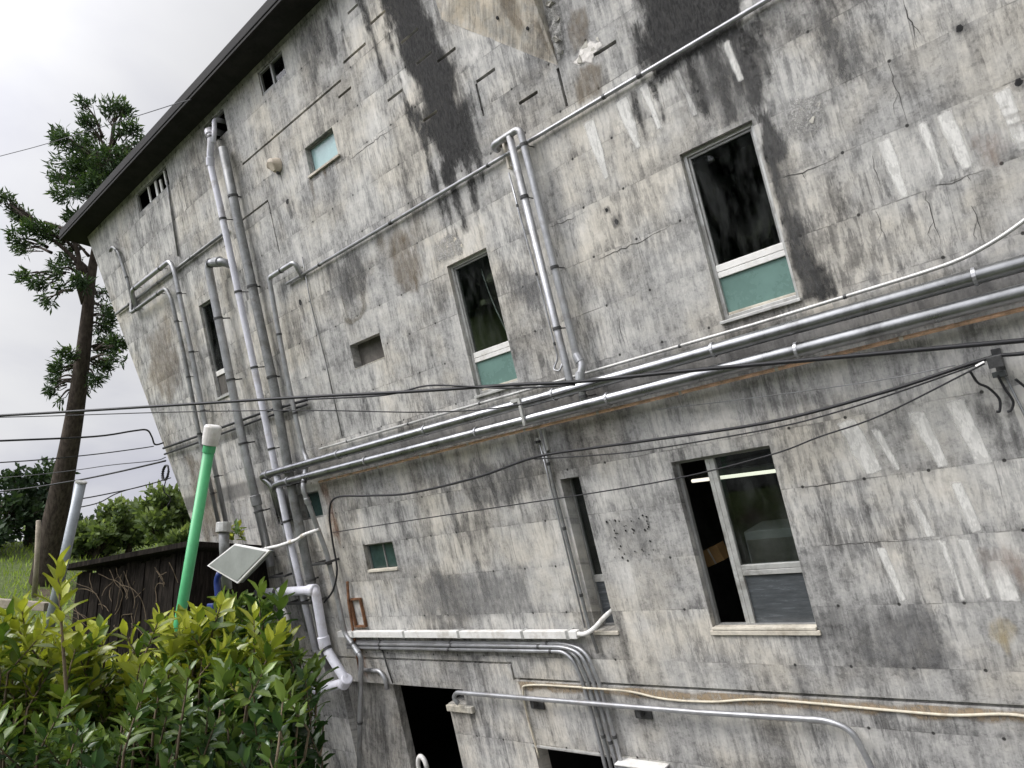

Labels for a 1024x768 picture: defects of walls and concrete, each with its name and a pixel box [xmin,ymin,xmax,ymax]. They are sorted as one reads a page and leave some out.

spalling [573,37,602,65]
damp [355,0,484,228]
damp [584,119,608,179]
damp [616,0,837,301]
crack [600,221,681,259]
crack [925,171,982,253]